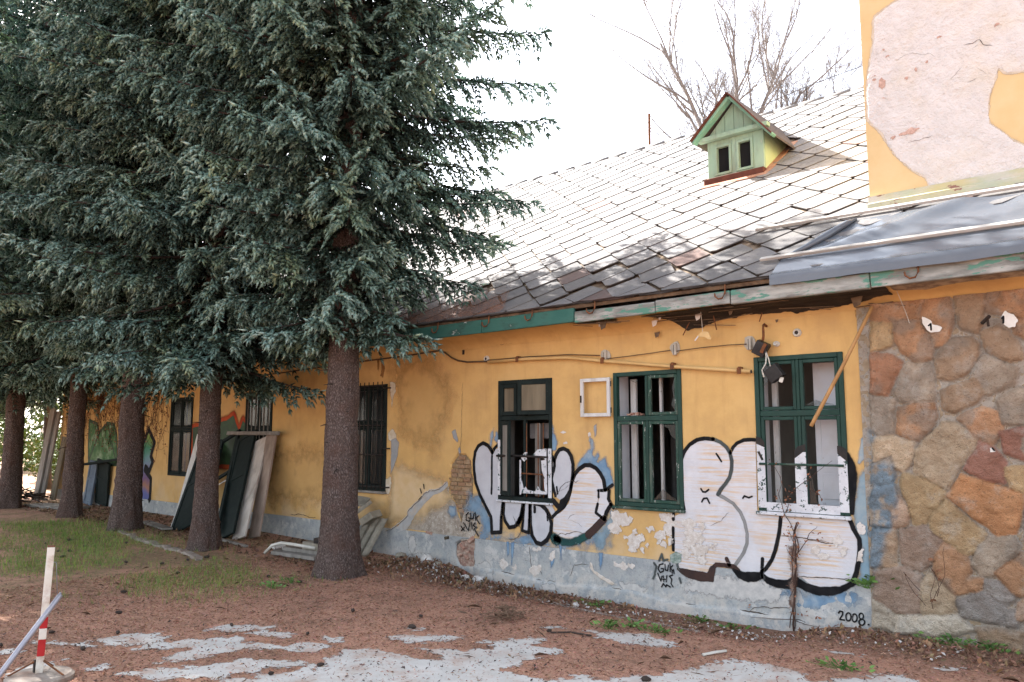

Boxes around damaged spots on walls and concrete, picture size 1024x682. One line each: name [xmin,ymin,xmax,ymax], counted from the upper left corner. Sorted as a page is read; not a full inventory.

peeling [865,0,1024,186]
peeling [695,313,711,341]
peeling [393,454,477,541]
peeling [607,510,677,571]